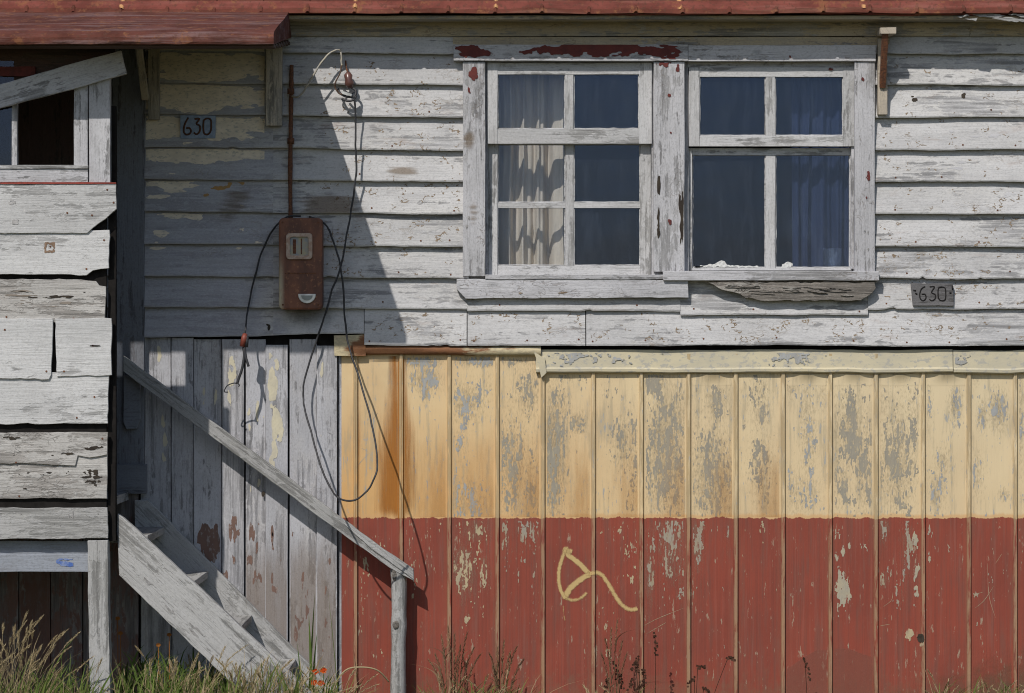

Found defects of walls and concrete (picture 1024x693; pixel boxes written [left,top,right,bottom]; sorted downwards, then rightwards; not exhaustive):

peeling [519,45,683,72]
rust [363,348,410,519]
peeling [407,357,439,401]
peeling [454,353,632,629]
peeling [606,375,731,606]
peeling [741,353,948,617]
peeling [977,381,1024,438]